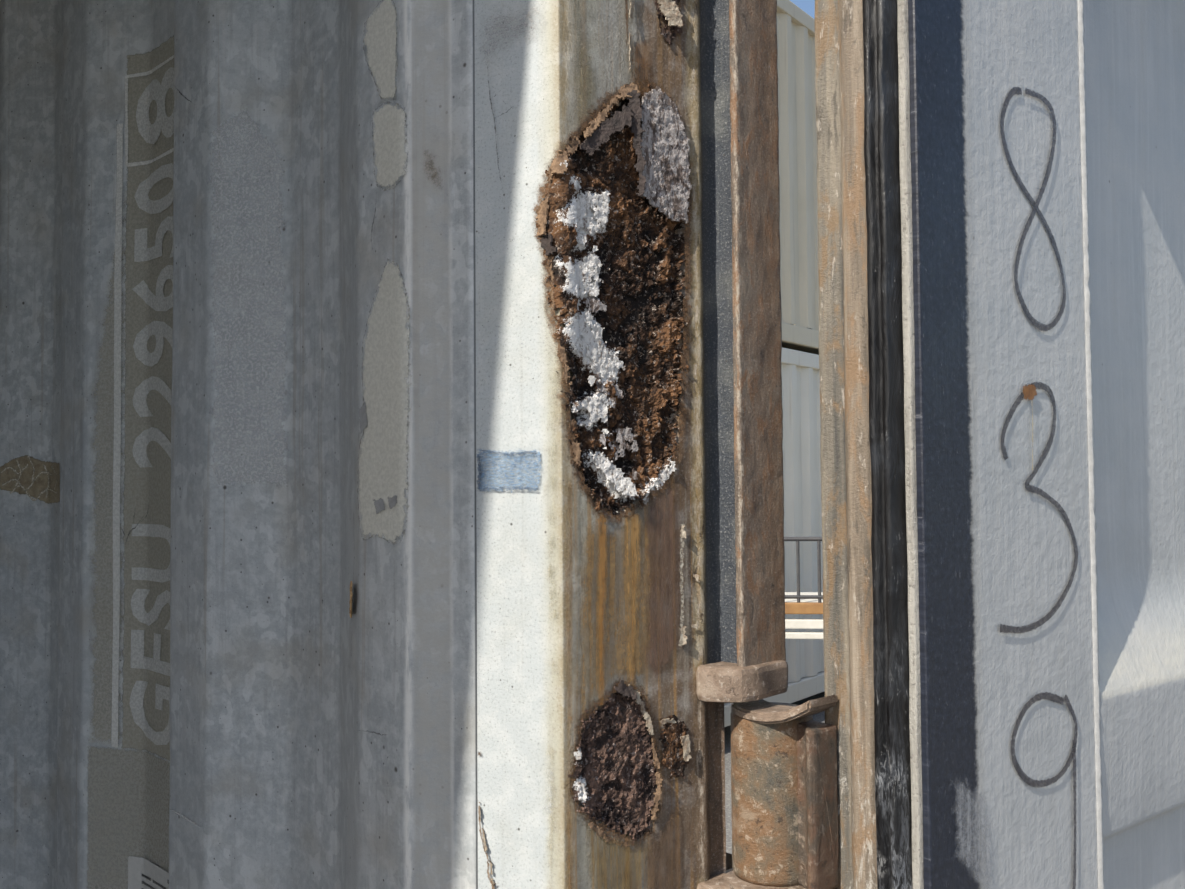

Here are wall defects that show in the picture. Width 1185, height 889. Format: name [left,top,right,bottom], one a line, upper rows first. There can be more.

peeling [363,0,408,190]
rust [654,0,684,45]
peeling [357,259,412,543]
rust [533,44,693,889]
crack [478,802,496,889]